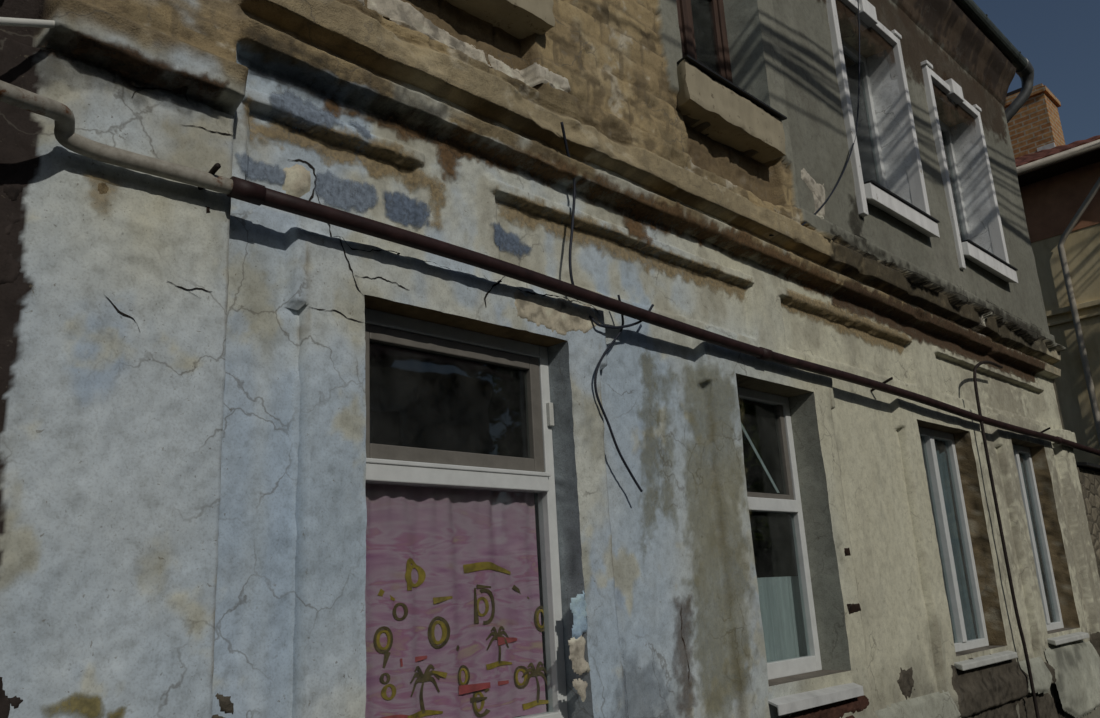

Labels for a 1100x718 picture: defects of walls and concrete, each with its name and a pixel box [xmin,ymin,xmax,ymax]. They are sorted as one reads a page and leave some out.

crack [126,82,235,136]
peeling [270,90,371,138]
peeling [236,153,286,184]
peeling [316,171,430,227]
crack [288,159,450,292]
crack [107,297,140,331]
crack [167,281,212,299]
crack [484,276,599,314]
peeling [568,591,590,702]
peeling [0,677,23,718]
damp [49,693,125,718]
spalling [781,695,869,718]